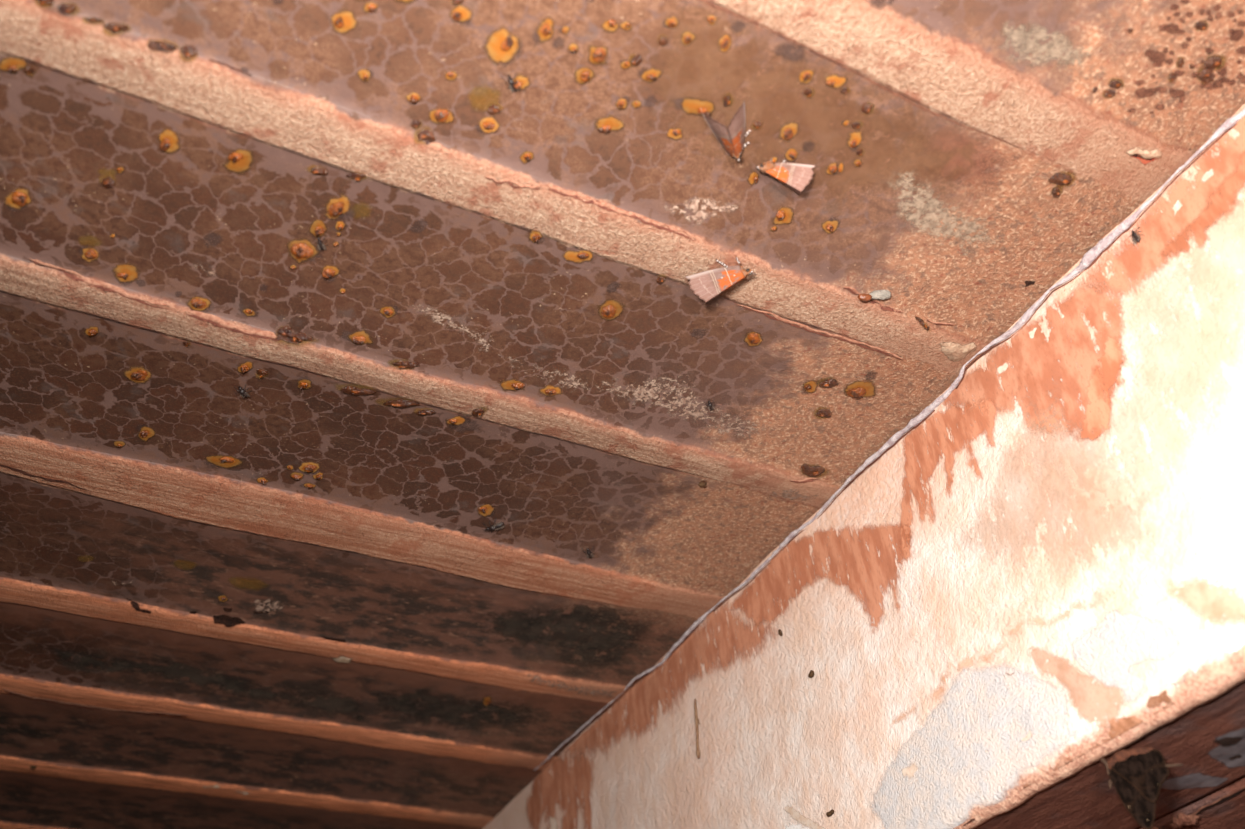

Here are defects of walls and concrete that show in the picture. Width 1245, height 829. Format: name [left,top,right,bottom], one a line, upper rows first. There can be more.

corrosion [35,0,129,35]
corrosion [147,40,197,61]
damp [663,11,1006,256]
corrosion [287,194,351,294]
crack [485,176,696,241]
crack [29,258,282,341]
crack [740,305,904,360]
damp [527,107,1245,829]
damp [492,605,647,666]
peeling [1073,610,1179,701]
peeling [872,665,1076,829]
peeling [1161,728,1245,790]